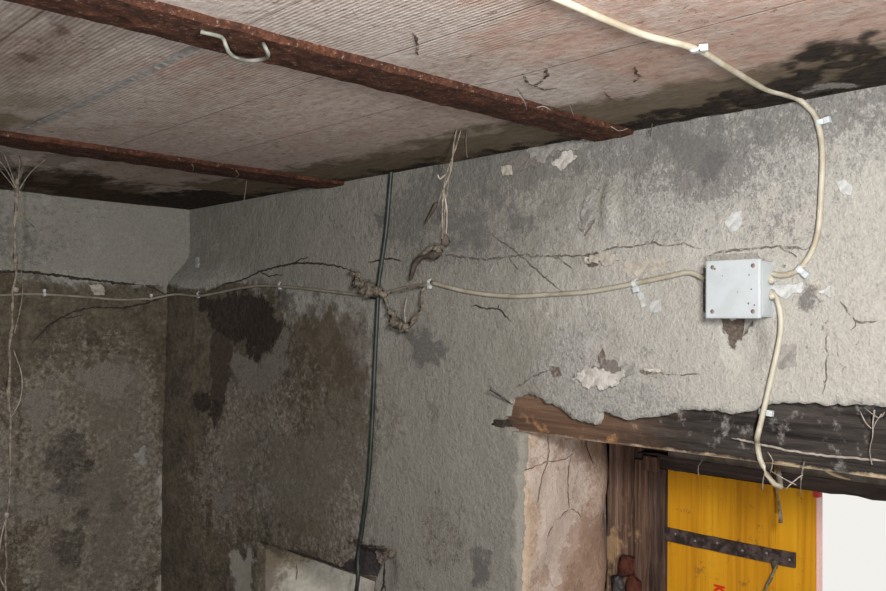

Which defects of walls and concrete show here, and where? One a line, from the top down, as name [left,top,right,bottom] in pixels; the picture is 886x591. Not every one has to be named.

crack [523,69,557,90]
damp [555,31,886,131]
damp [0,122,583,210]
crack [445,233,806,292]
damp [192,288,294,427]
spalling [550,348,664,390]
spalling [721,319,753,349]
crack [524,435,593,538]